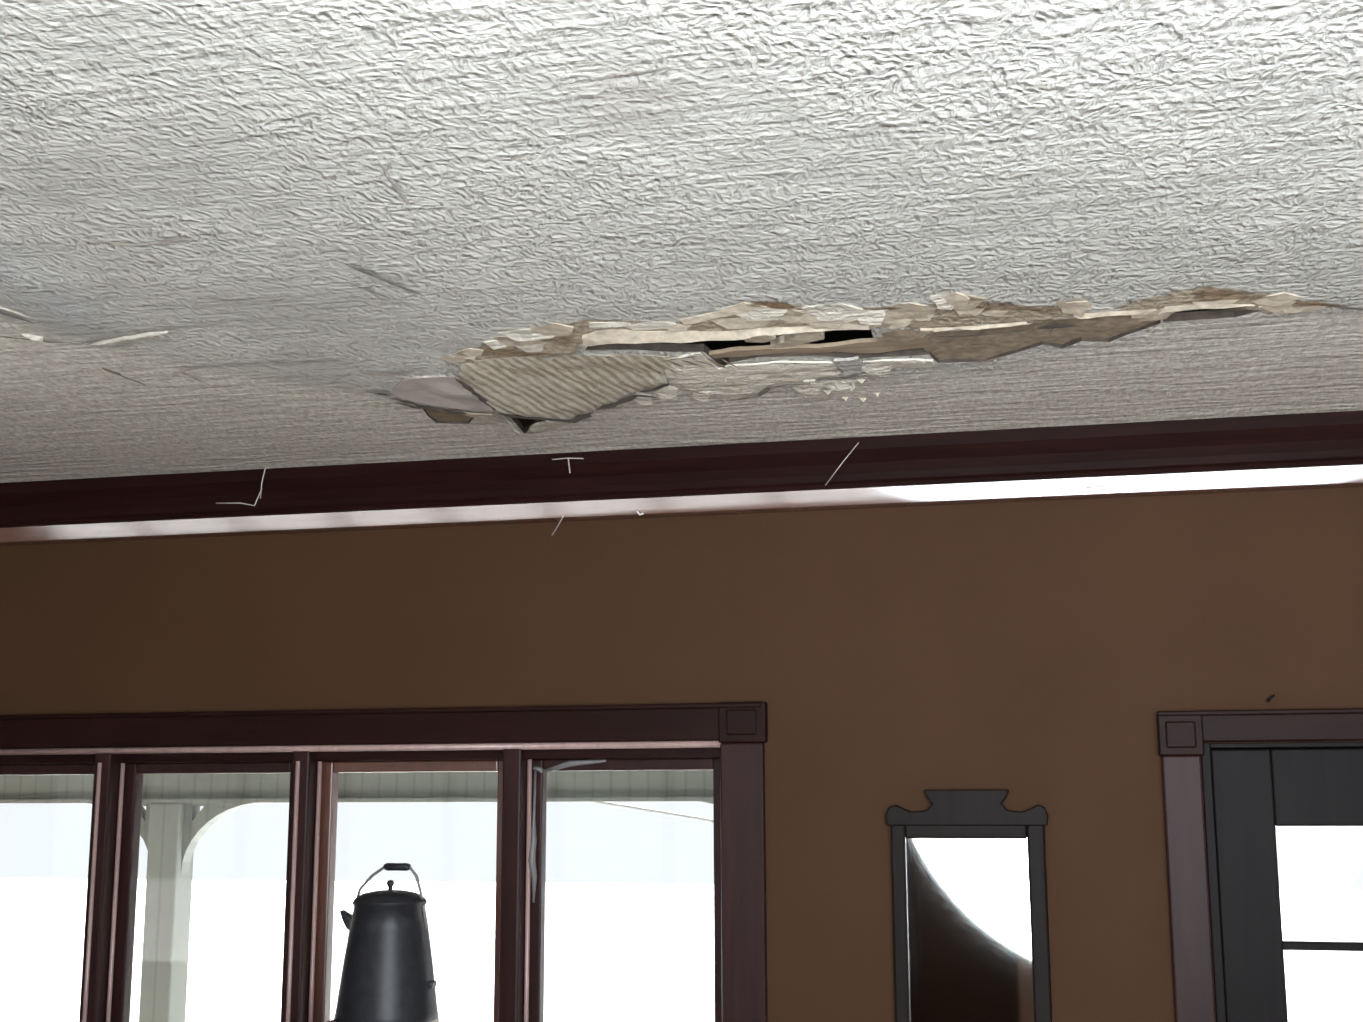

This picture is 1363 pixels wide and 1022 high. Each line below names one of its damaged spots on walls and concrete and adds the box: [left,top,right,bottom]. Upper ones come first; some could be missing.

crack [83,238,193,247]
crack [1295,302,1363,311]
crack [0,306,396,385]
crack [179,360,427,386]
peeling [370,287,1331,436]